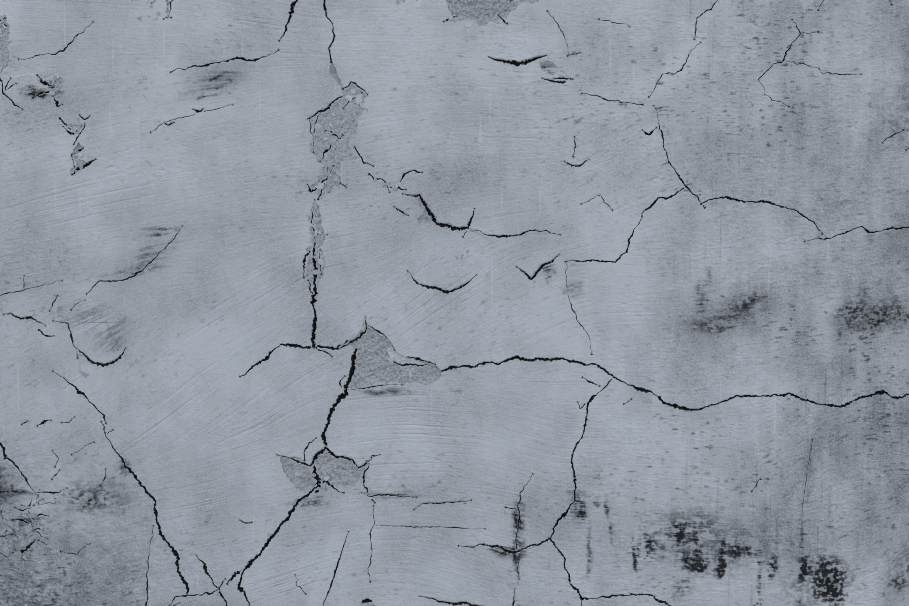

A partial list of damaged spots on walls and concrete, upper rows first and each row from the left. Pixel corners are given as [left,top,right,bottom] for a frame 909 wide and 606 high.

crack [0,21,93,110]
crack [171,0,298,73]
crack [322,0,336,62]
spalling [444,0,539,27]
spalling [305,63,368,295]
crack [0,80,380,606]
spalling [321,311,441,392]
crack [442,0,909,606]
peeling [274,425,475,512]
leakage [633,533,656,570]
leakage [674,522,778,593]
leakage [799,556,843,605]